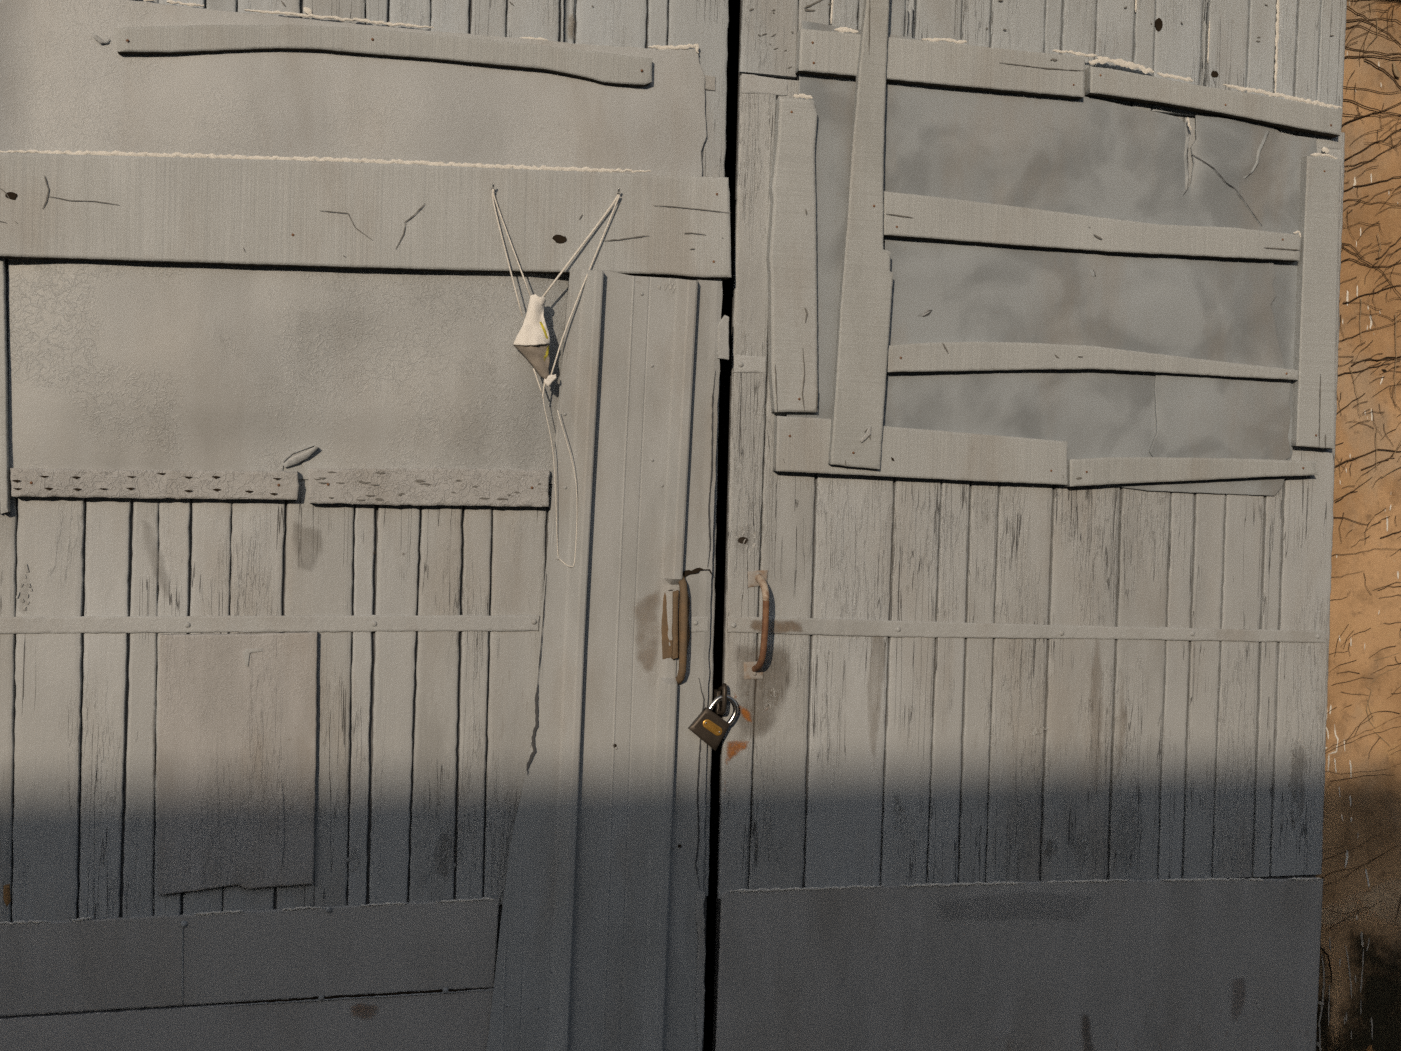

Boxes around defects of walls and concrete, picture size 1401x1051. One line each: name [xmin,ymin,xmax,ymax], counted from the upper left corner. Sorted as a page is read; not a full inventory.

damp [1316,935,1401,1051]